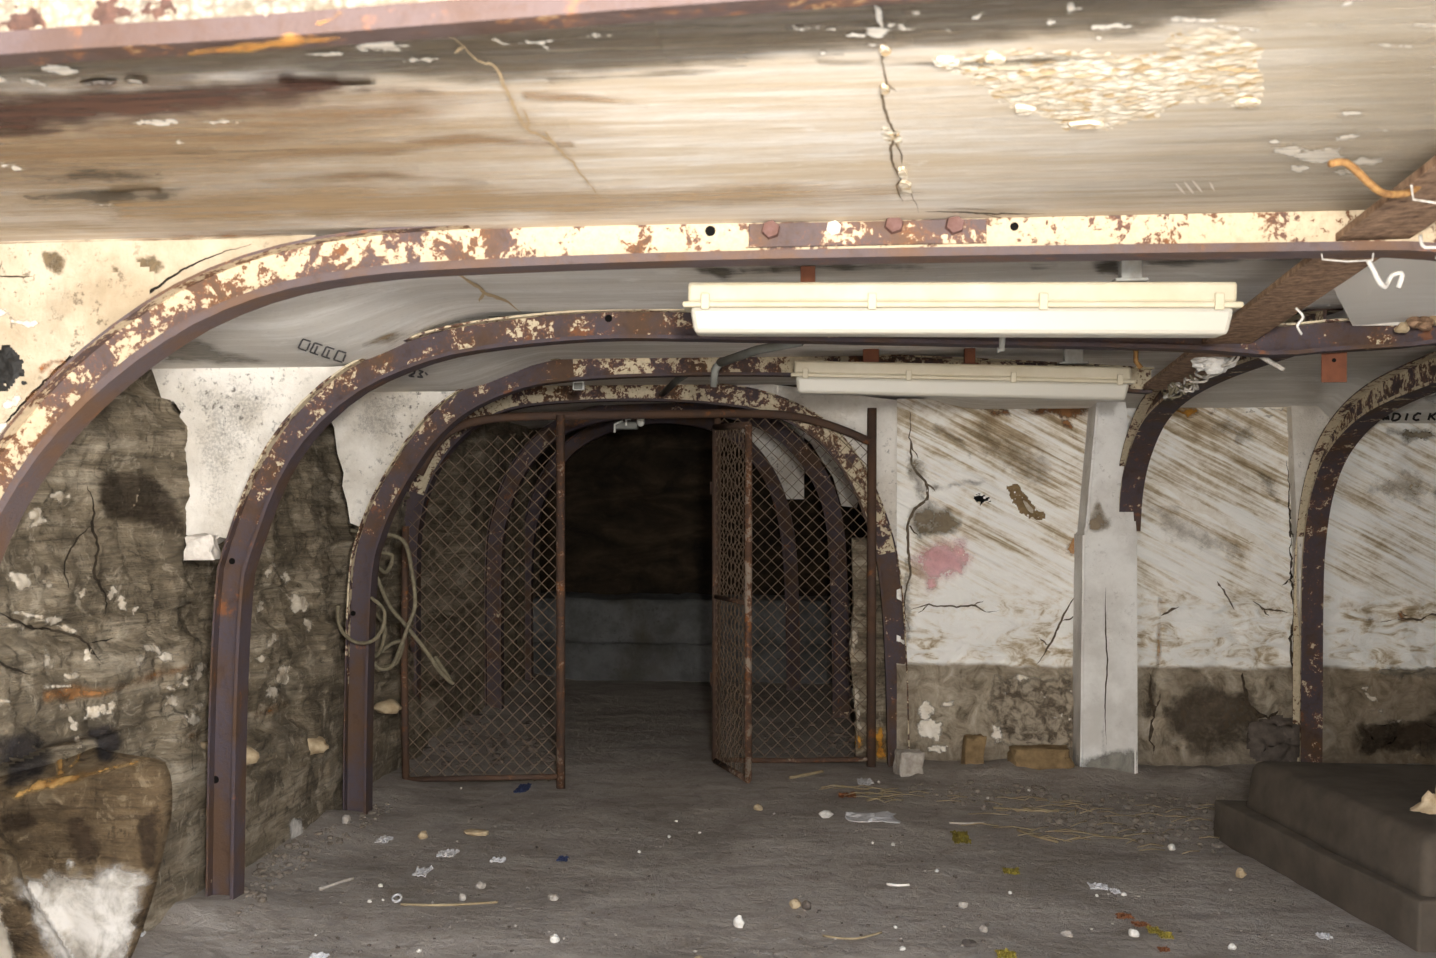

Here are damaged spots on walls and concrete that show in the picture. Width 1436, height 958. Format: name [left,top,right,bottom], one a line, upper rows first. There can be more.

corrosion [189,38,337,55]
peeling [309,42,438,62]
peeling [493,38,554,50]
spalling [931,17,1265,132]
crack [881,45,1036,219]
corrosion [1030,408,1088,429]
crack [904,413,995,629]
crack [0,486,113,662]
leakage [1380,667,1436,676]
leakage [1146,685,1261,752]
leakage [1359,719,1436,756]
corrosion [15,756,80,797]